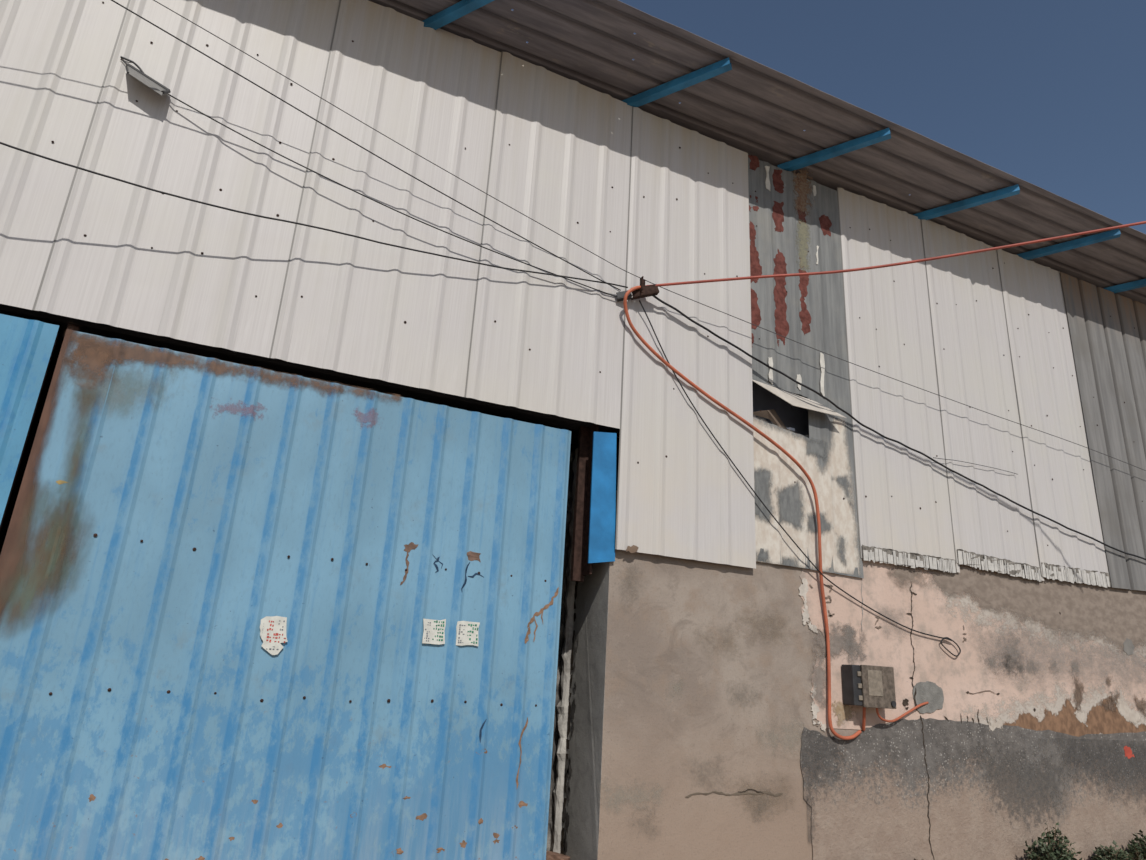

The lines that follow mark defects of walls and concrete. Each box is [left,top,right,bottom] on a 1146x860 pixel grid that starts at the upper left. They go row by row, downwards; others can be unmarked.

rust [748,155,760,171]
rust [749,169,832,346]
rust [0,326,375,623]
rust [525,587,559,644]
peeling [753,418,1146,737]
rust [516,717,528,808]
crack [686,789,783,798]
crack [906,585,989,860]